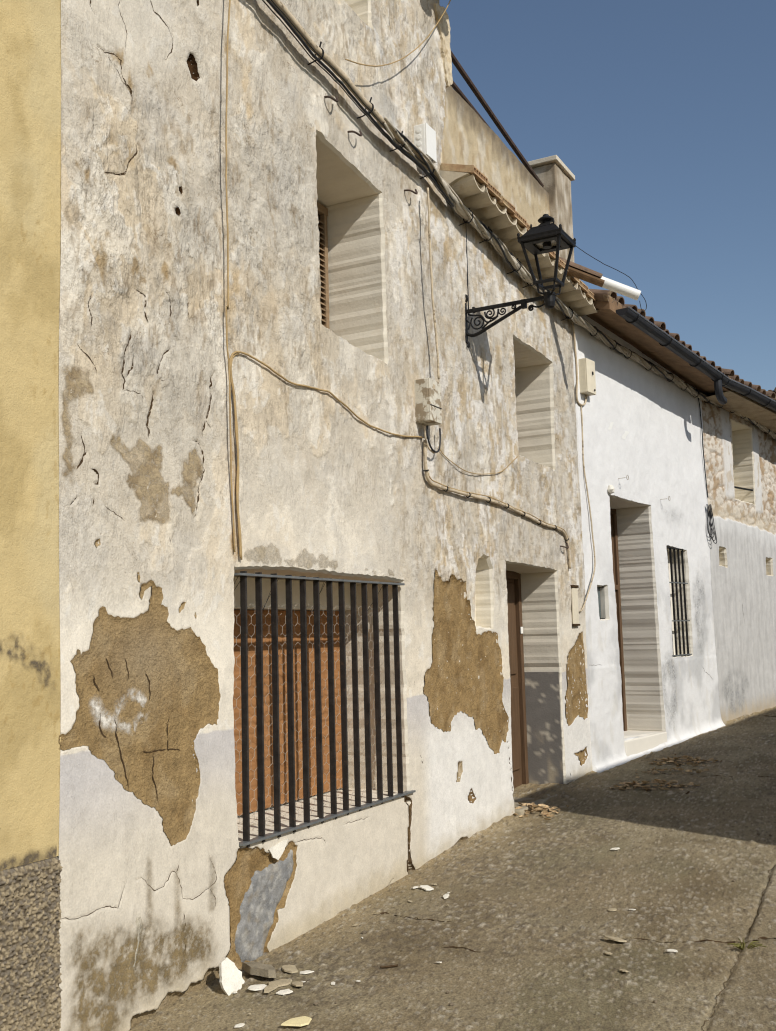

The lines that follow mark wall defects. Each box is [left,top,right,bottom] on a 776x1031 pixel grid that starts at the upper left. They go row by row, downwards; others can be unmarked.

crack [97,2,132,97]
crack [105,147,138,175]
crack [78,287,189,436]
crack [193,378,212,512]
flaking render [59,572,221,846]
flaking render [423,570,509,754]
flaking render [565,631,588,726]
crack [61,863,217,949]
water stain [73,923,211,1031]
flaking render [130,838,298,1030]